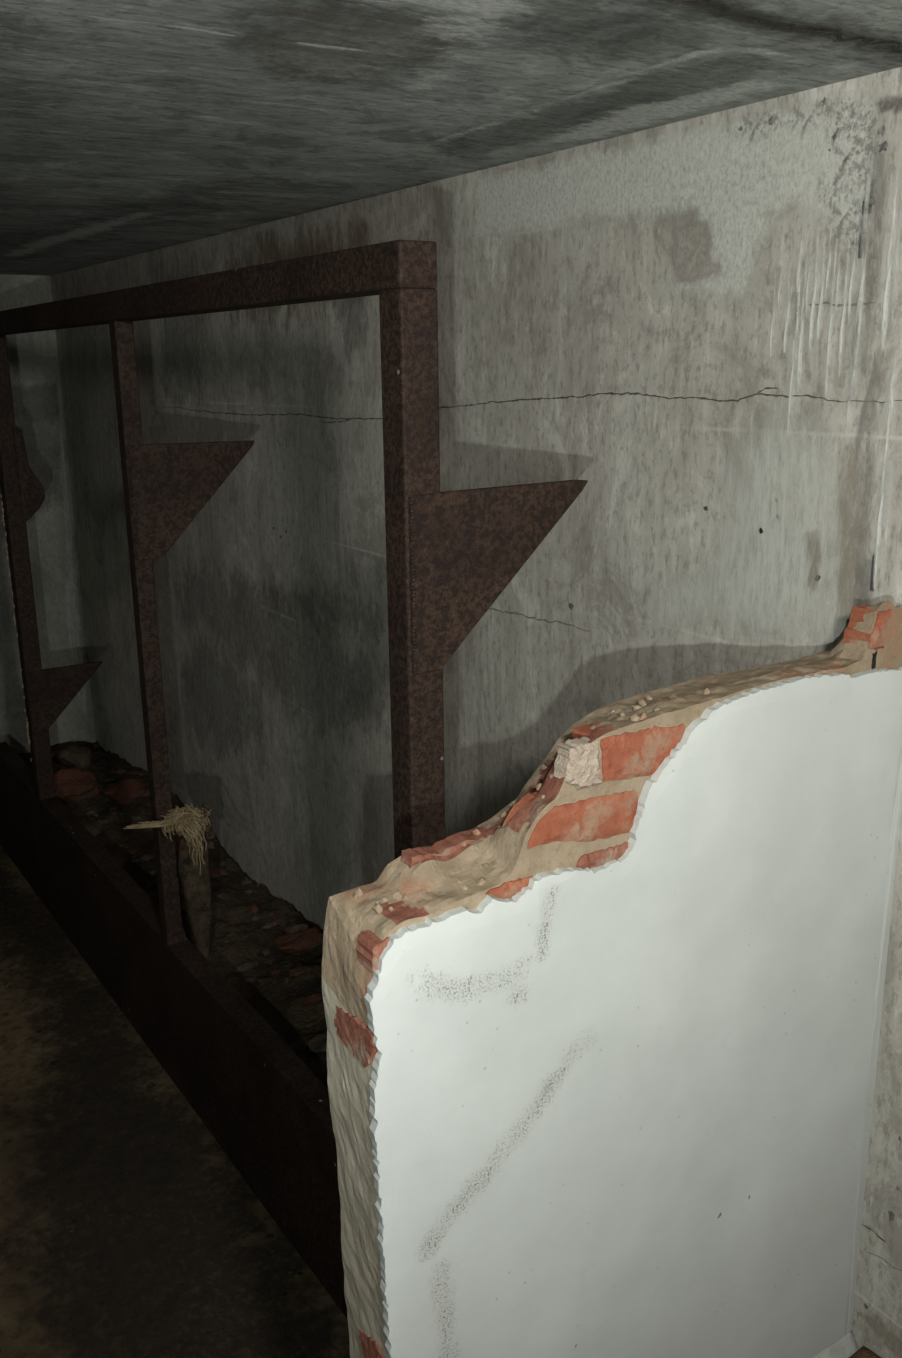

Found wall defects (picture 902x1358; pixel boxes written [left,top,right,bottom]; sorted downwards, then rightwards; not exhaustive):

water stain [297,42,363,51]
water stain [366,0,528,95]
crack [439,387,902,409]
crack [167,407,382,423]